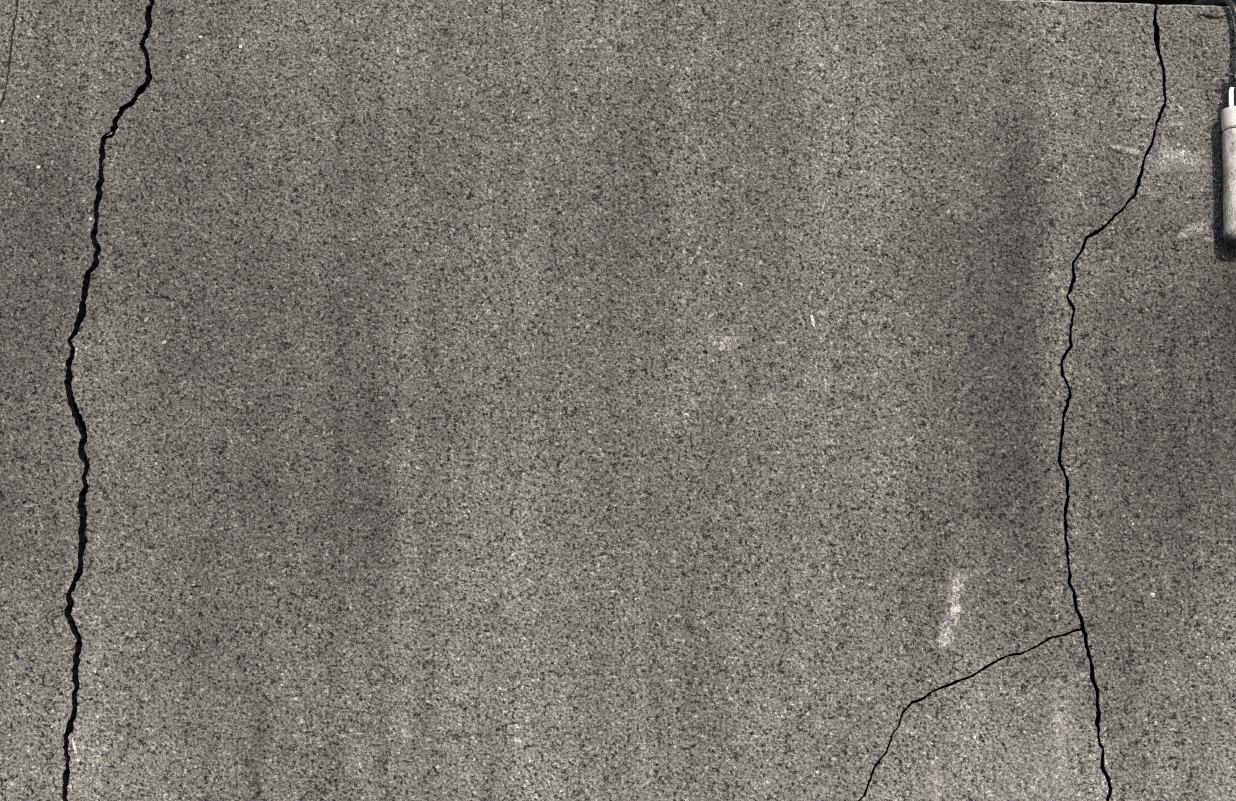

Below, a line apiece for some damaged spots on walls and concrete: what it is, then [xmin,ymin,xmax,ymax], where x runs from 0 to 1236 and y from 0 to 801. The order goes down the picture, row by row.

crack [62,0,155,801]
crack [858,6,1167,801]